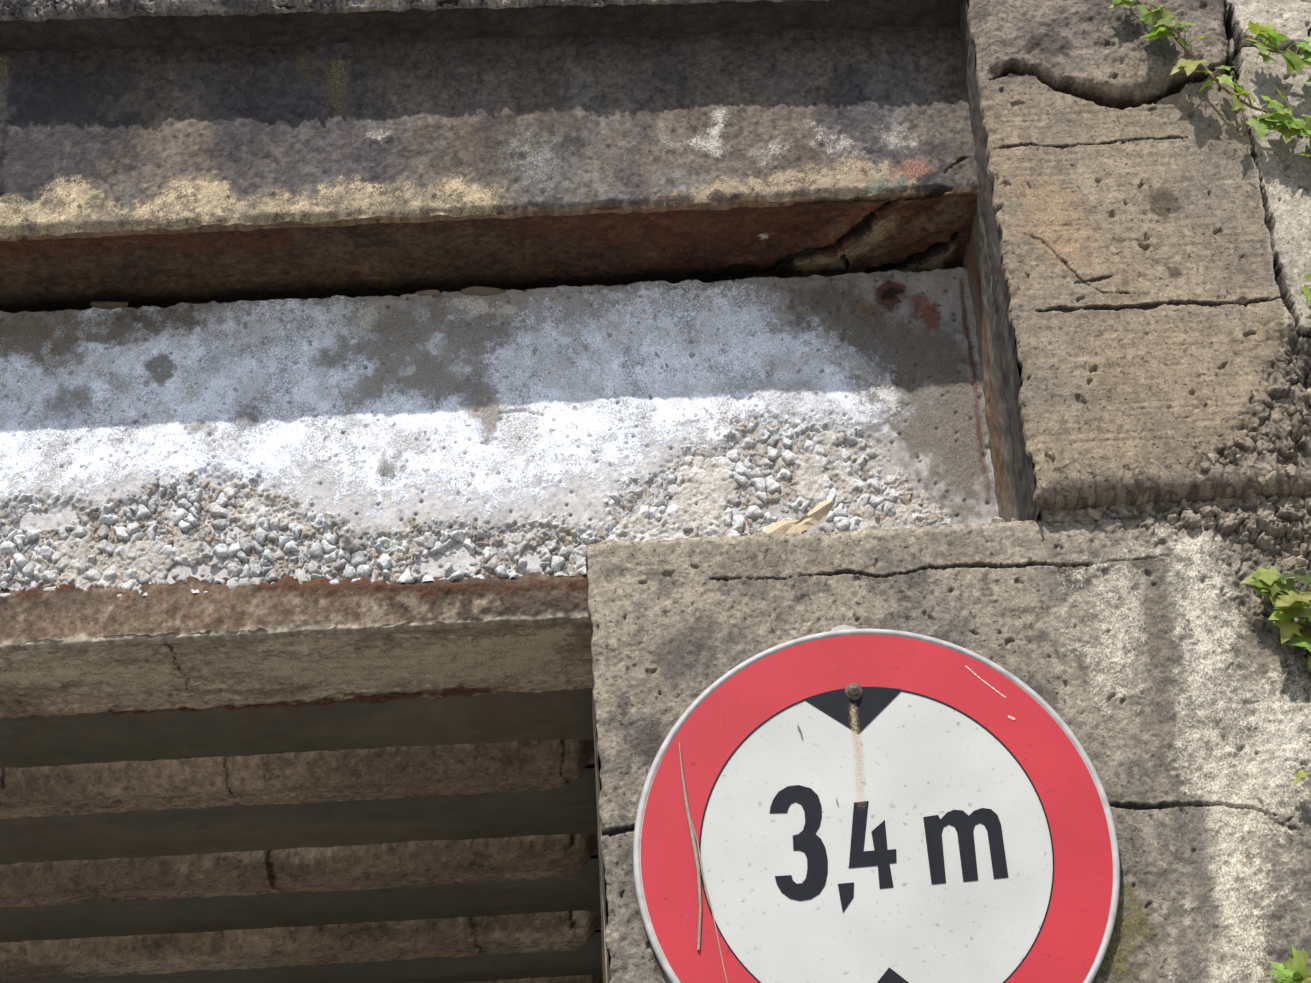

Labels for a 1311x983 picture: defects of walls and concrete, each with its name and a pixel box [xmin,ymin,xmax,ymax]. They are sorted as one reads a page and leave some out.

water stain [0,58,167,224]
water stain [366,129,391,141]
water stain [460,109,580,200]
water stain [659,109,725,158]
water stain [811,123,858,157]
crack [711,5,1311,339]
rust [855,280,941,329]
rust [960,239,1002,483]
water stain [0,276,997,524]
rust [17,581,125,599]
rust [257,576,587,598]
crack [712,556,1166,581]